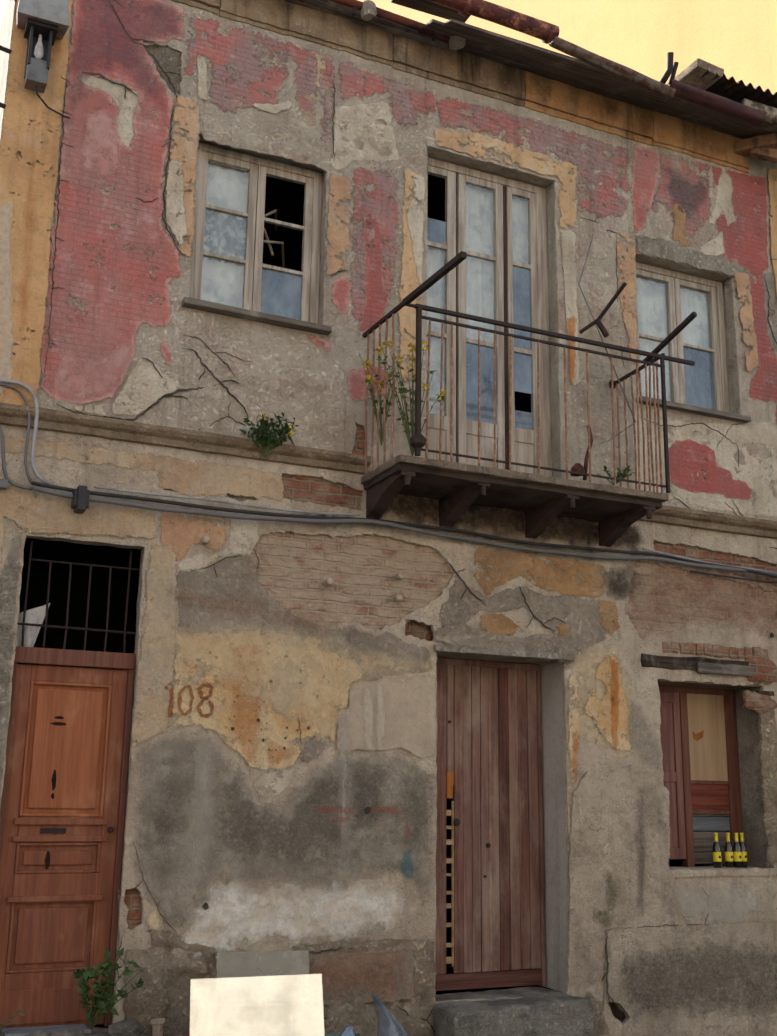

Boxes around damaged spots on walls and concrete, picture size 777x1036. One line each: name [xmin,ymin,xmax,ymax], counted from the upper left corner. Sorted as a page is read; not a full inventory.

flaking render [81,73,139,148]
flaking render [146,45,182,95]
peeling [197,58,208,100]
crack [43,72,251,426]
peeling [166,160,187,251]
flaking render [673,172,736,256]
flaking render [225,493,256,501]
peeling [160,505,259,571]
flaking render [405,620,431,641]
damp [136,686,433,955]
flaking render [118,888,142,929]
crack [601,888,711,1007]